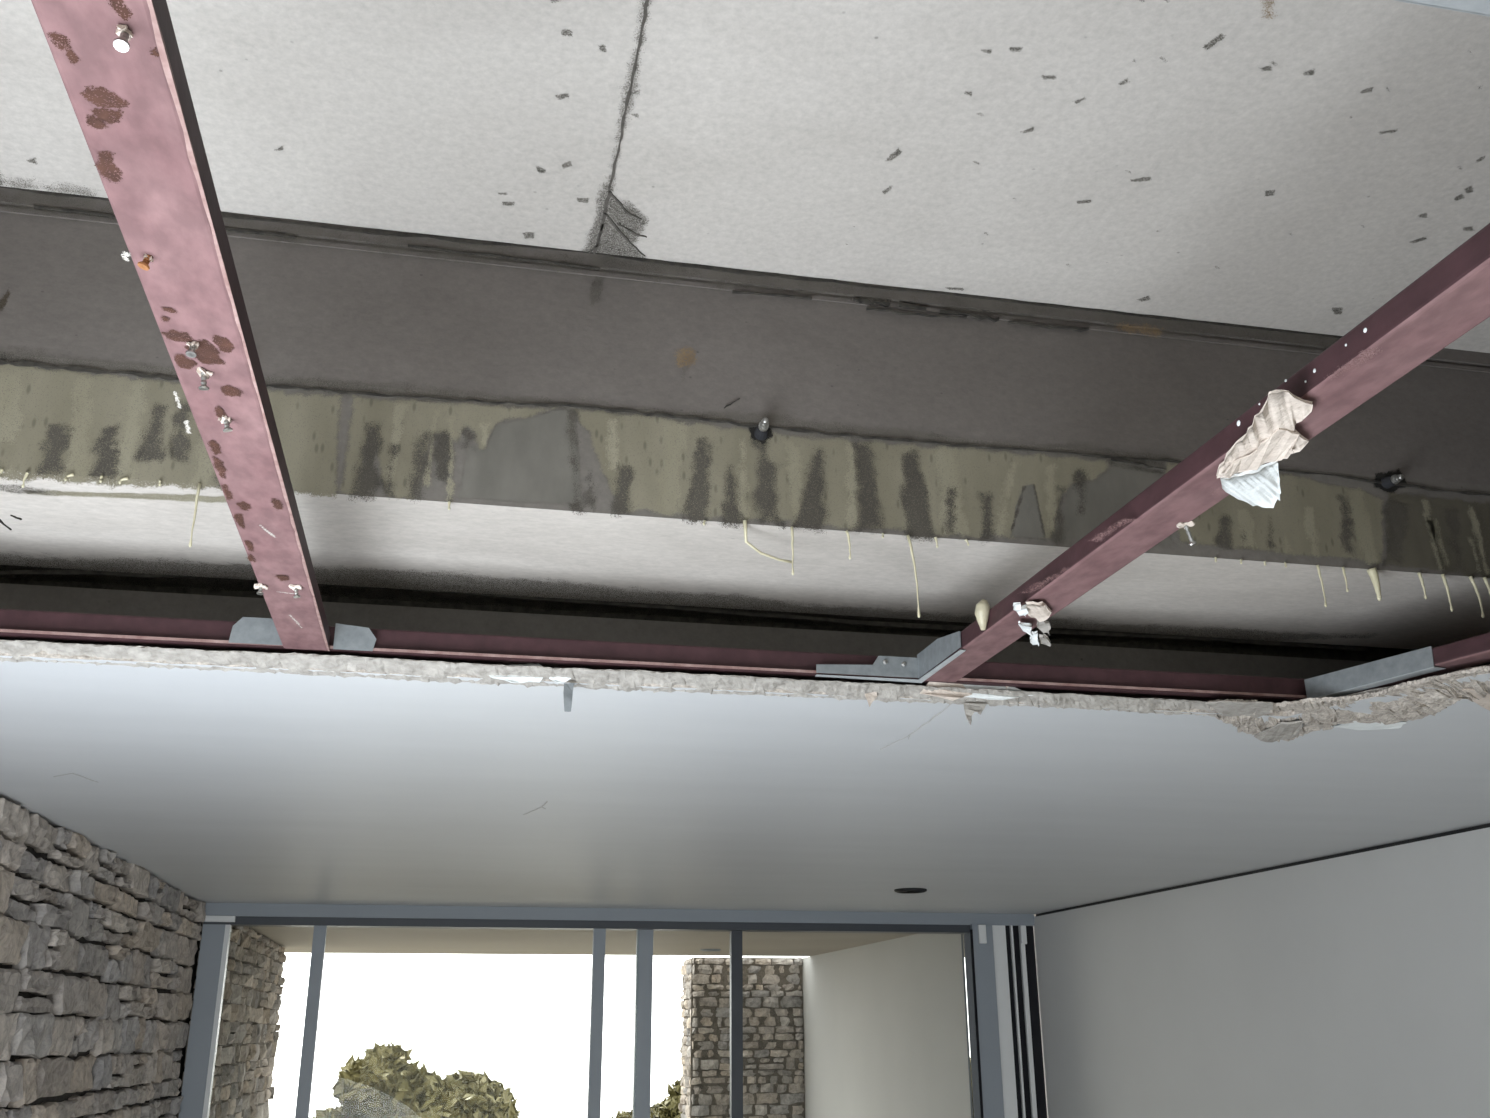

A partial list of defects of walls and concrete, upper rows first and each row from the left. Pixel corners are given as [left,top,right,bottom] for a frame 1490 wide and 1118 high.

corrosion [48,32,79,64]
corrosion [79,85,130,129]
crack [0,174,117,228]
corrosion [94,151,123,184]
crack [221,0,1343,353]
corrosion [160,307,234,370]
leakage [0,364,258,592]
corrosion [207,440,255,562]
leakage [267,388,1109,633]
leakage [1178,472,1490,618]
leakage [1024,616,1374,647]
spalling [0,640,1490,742]